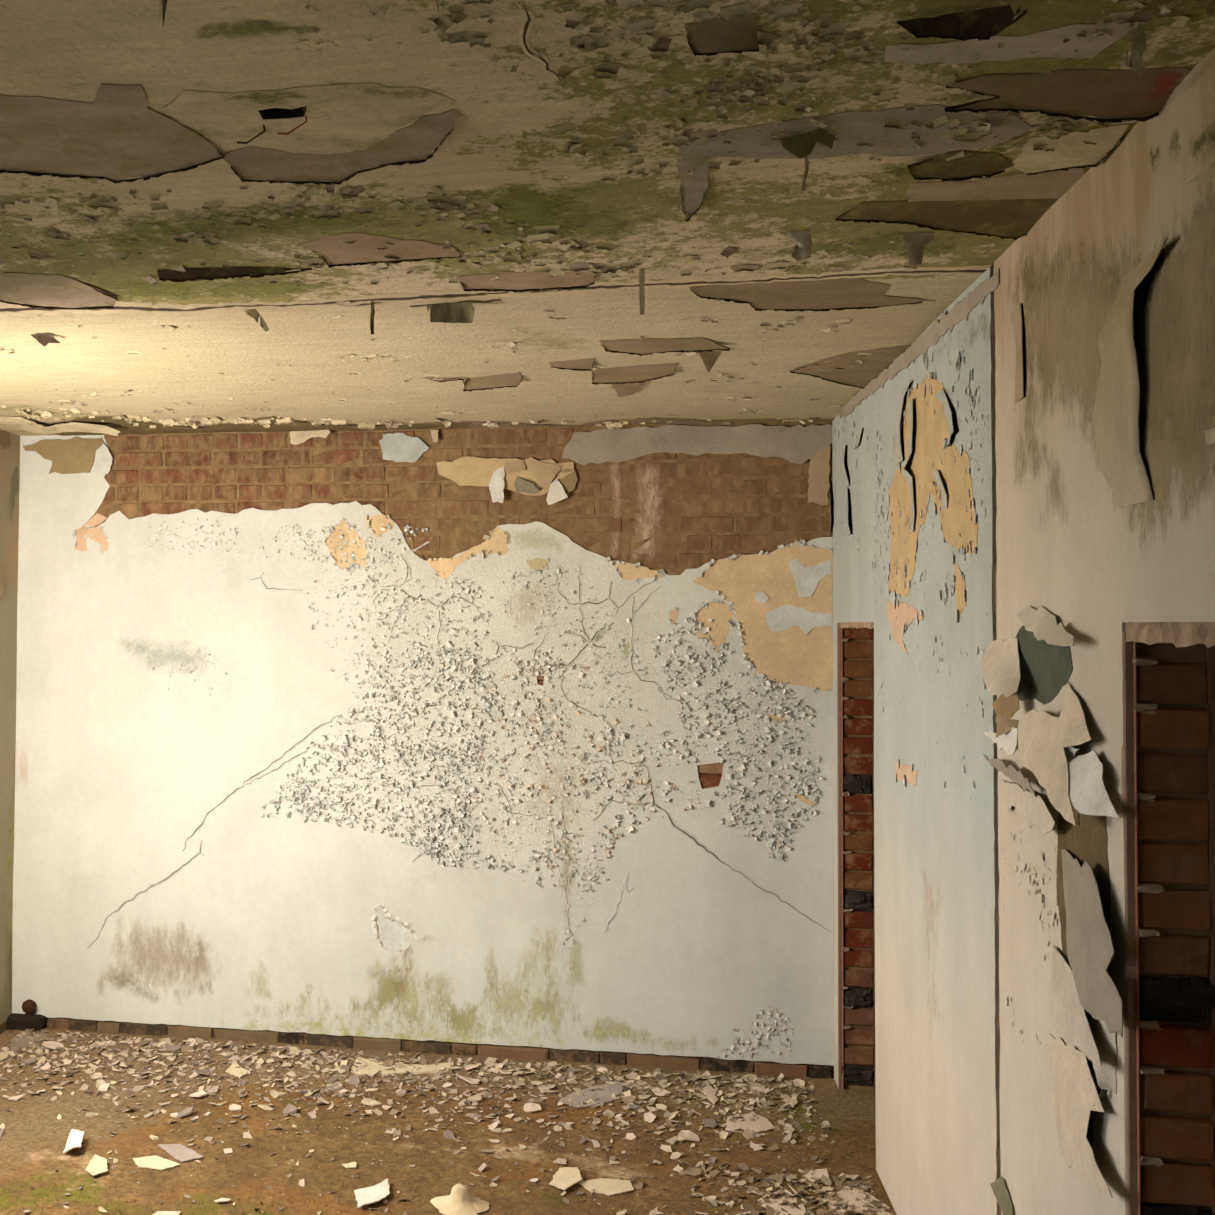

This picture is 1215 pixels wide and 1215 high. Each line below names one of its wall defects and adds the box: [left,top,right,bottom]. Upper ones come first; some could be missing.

peeling [159,0,167,25]
peeling [420,0,499,63]
peeling [556,0,1193,269]
water stain [1024,245,1140,422]
water stain [1130,194,1215,538]
flaking render [0,83,999,973]
crack [86,715,337,950]
crack [372,542,831,933]